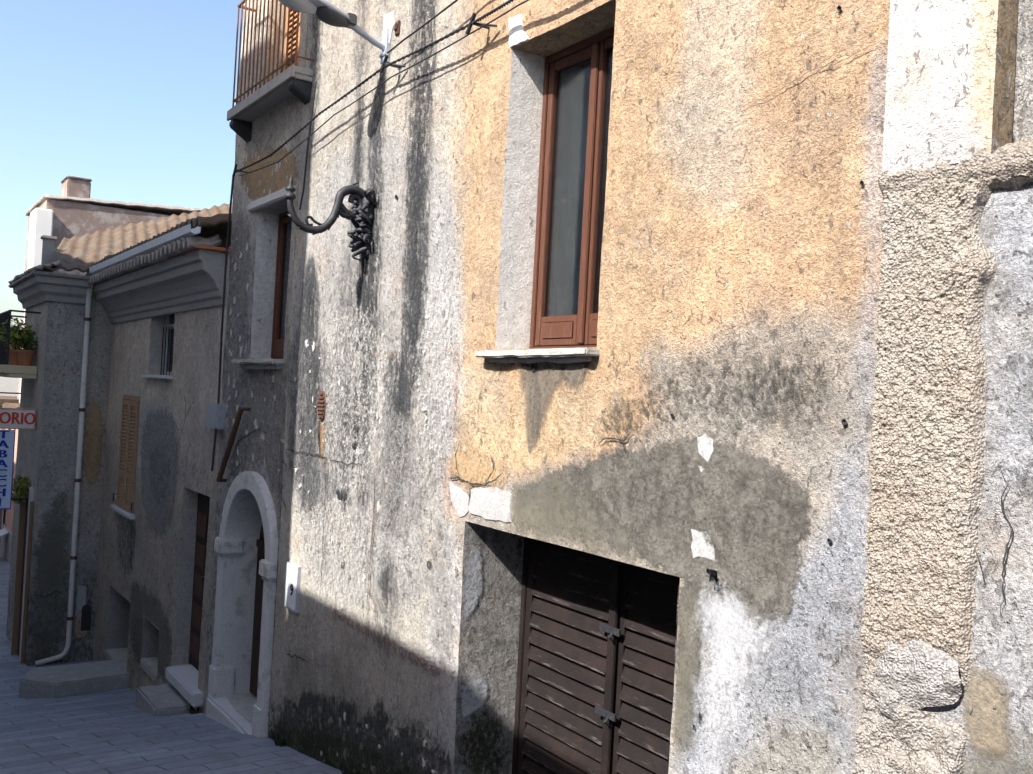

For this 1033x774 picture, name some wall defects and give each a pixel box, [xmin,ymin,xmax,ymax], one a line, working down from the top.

water stain [309,14,322,163]
water stain [335,0,437,535]
water stain [30,494,69,664]
water stain [117,519,172,673]
water stain [297,257,320,515]
crack [450,441,498,498]
water stain [512,350,828,774]
crack [974,469,1013,618]